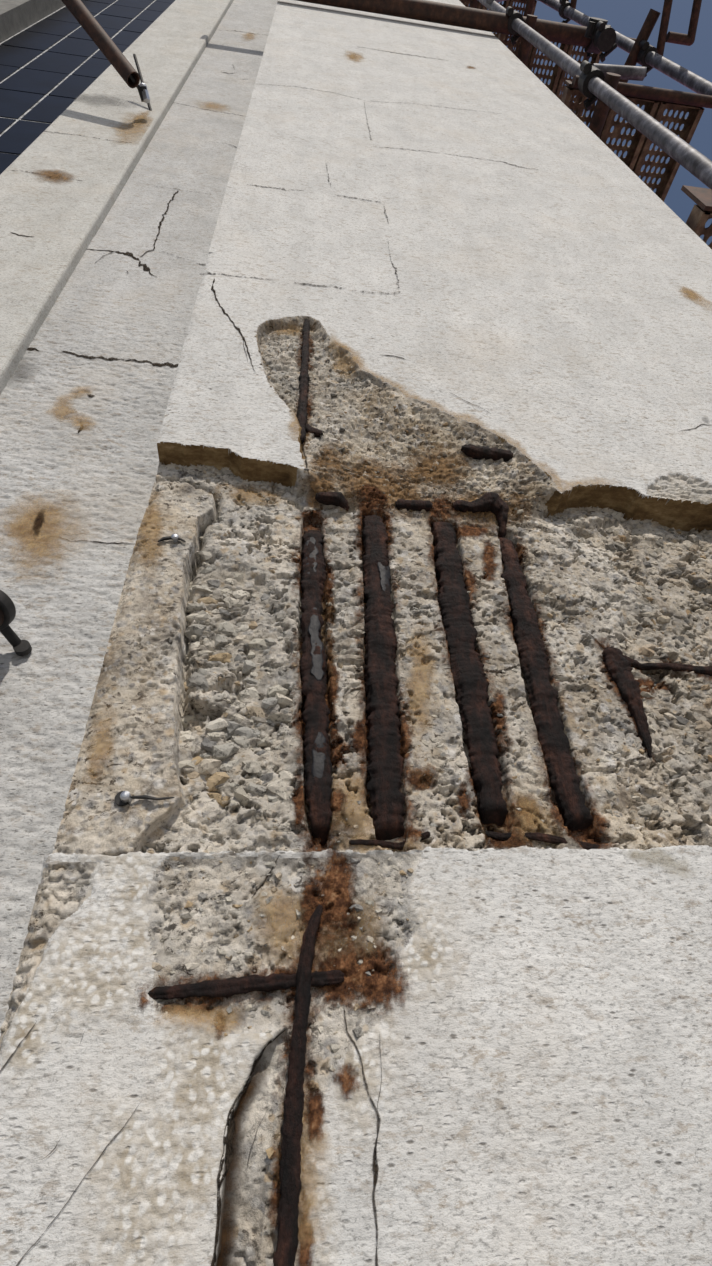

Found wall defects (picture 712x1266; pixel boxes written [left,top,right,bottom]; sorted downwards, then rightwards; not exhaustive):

crack [27,347,178,368]
crack [90,165,400,371]
rust [12,501,68,552]
rust [139,449,529,1266]
spalling [0,316,712,1266]
rust [455,743,616,849]
rust [601,658,712,735]
crack [344,1010,382,1266]